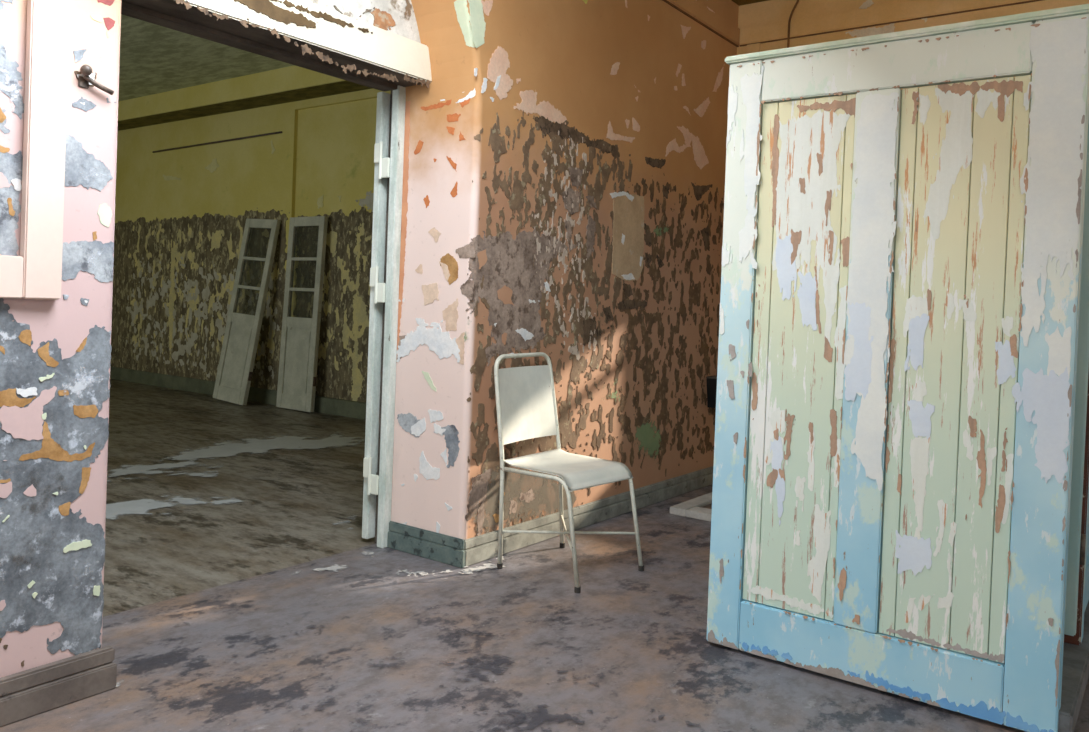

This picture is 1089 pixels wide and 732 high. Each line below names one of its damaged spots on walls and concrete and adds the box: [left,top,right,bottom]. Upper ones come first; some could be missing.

peeling [0,43,24,256]
peeling [73,49,97,87]
peeling [72,97,117,112]
peeling [845,23,895,38]
peeling [396,0,753,536]
peeling [0,134,374,655]